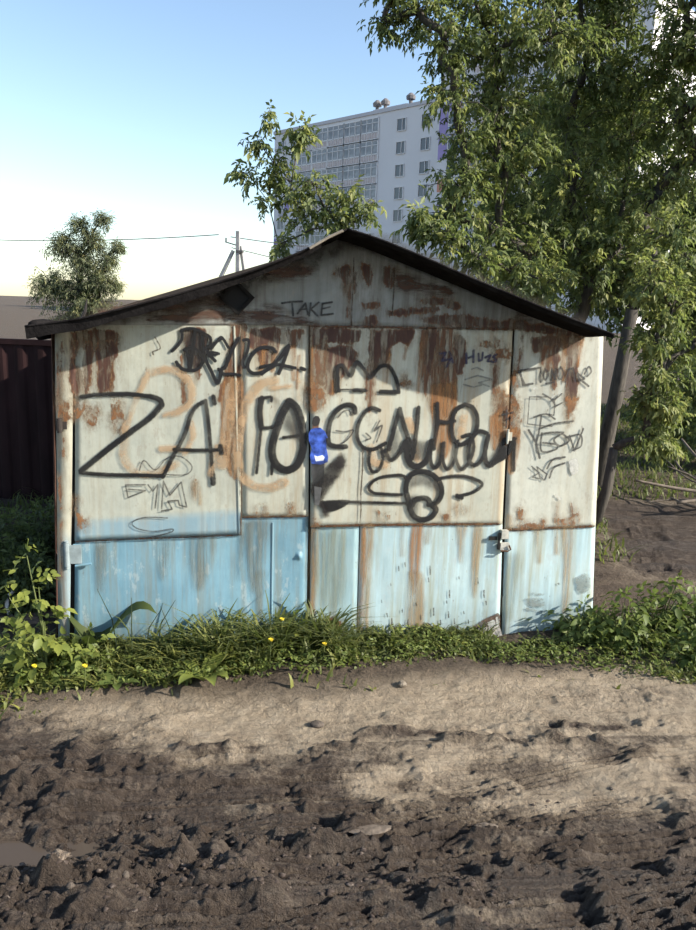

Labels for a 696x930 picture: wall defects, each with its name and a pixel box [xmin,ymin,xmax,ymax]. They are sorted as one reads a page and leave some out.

rust [55,328,119,426]
rust [111,400,125,433]
rust [148,263,585,479]
rust [243,502,594,632]